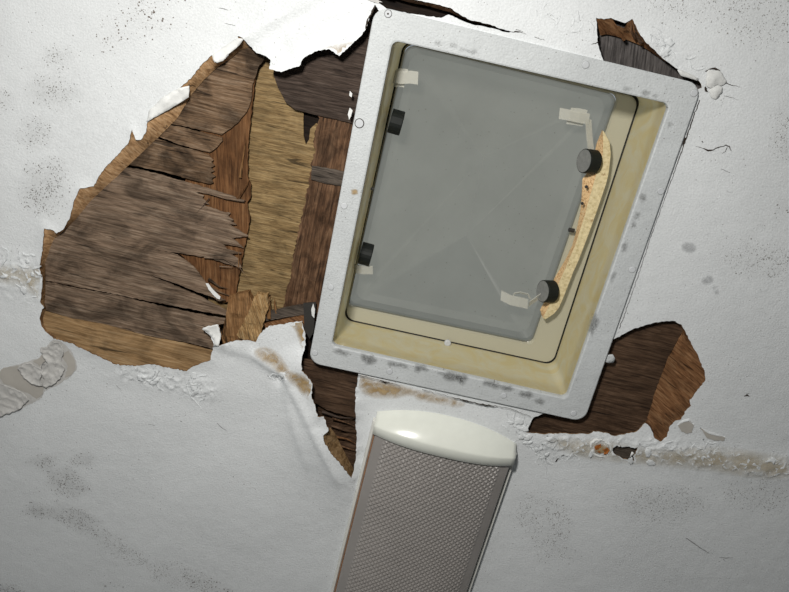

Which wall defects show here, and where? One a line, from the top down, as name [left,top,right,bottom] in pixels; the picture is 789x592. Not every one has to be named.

peeling [650,27,706,70]
crack [620,67,735,327]
peeling [0,340,77,417]
corrosion [590,438,613,457]